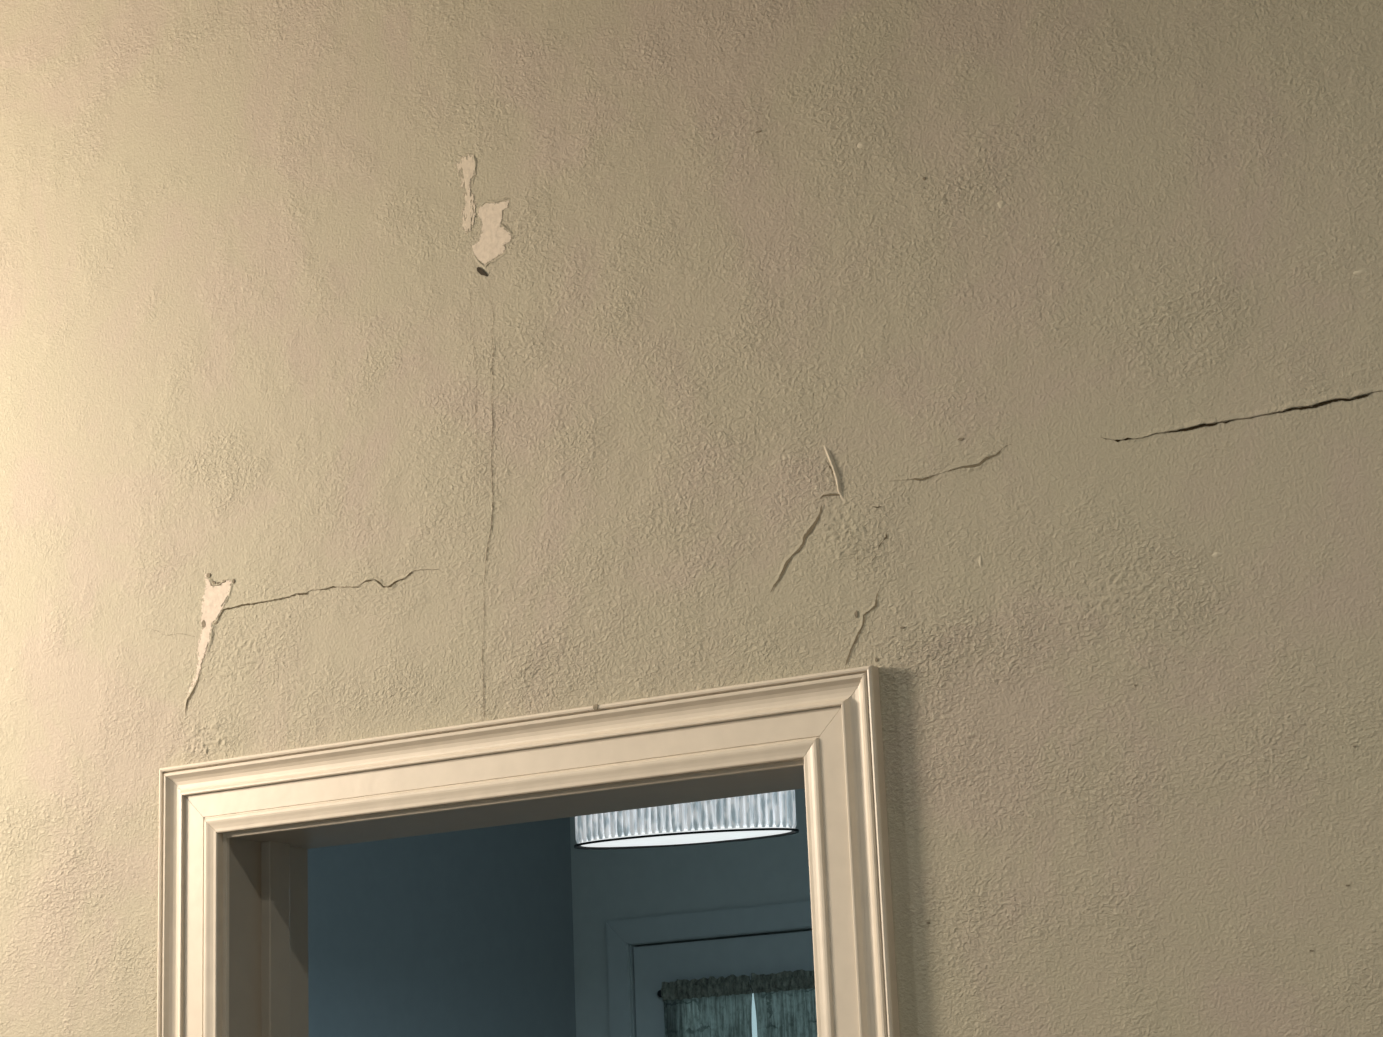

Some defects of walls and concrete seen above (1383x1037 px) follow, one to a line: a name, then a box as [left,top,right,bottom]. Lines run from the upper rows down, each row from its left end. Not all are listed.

peeling [454,153,514,276]
crack [1100,385,1383,444]
crack [768,491,843,593]
crack [844,440,1014,666]
peeling [187,573,235,696]
crack [184,567,445,717]